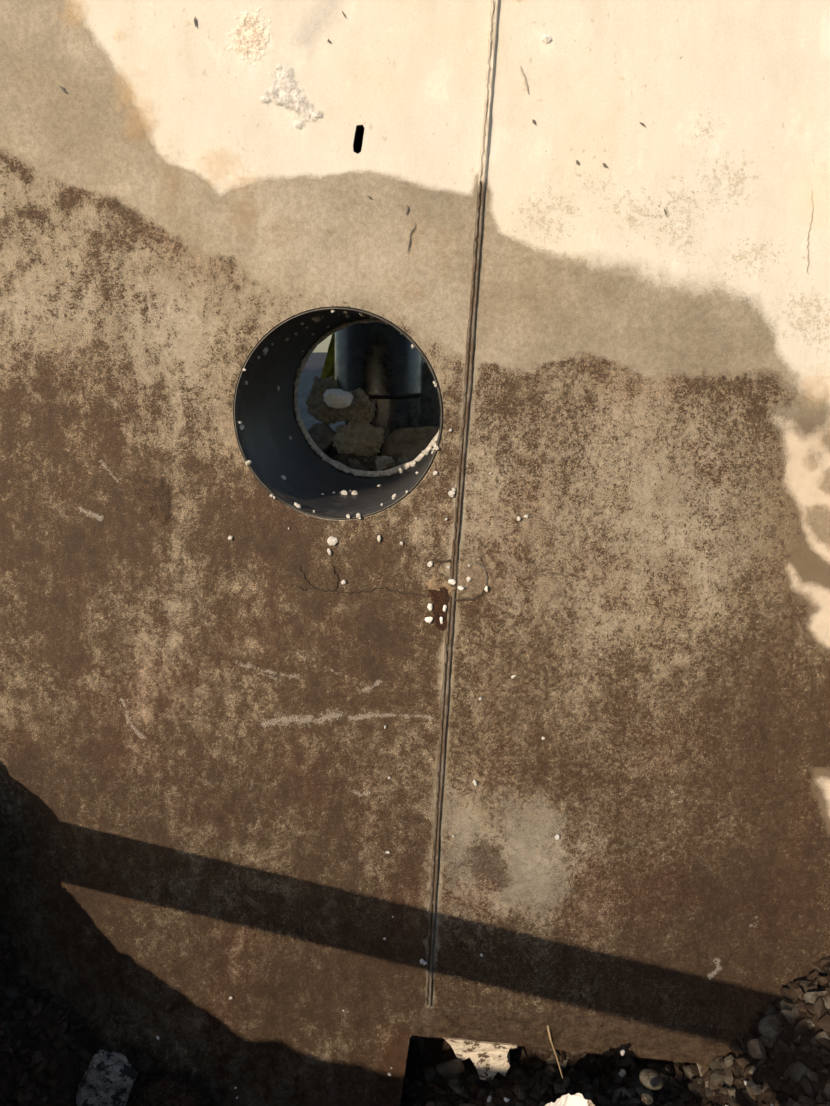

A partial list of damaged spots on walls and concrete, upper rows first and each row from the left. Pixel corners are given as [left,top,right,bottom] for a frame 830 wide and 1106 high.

water stain [127,535,252,718]
water stain [0,0,479,586]
crack [294,0,494,1005]
crack [520,66,529,93]
water stain [391,184,830,1015]